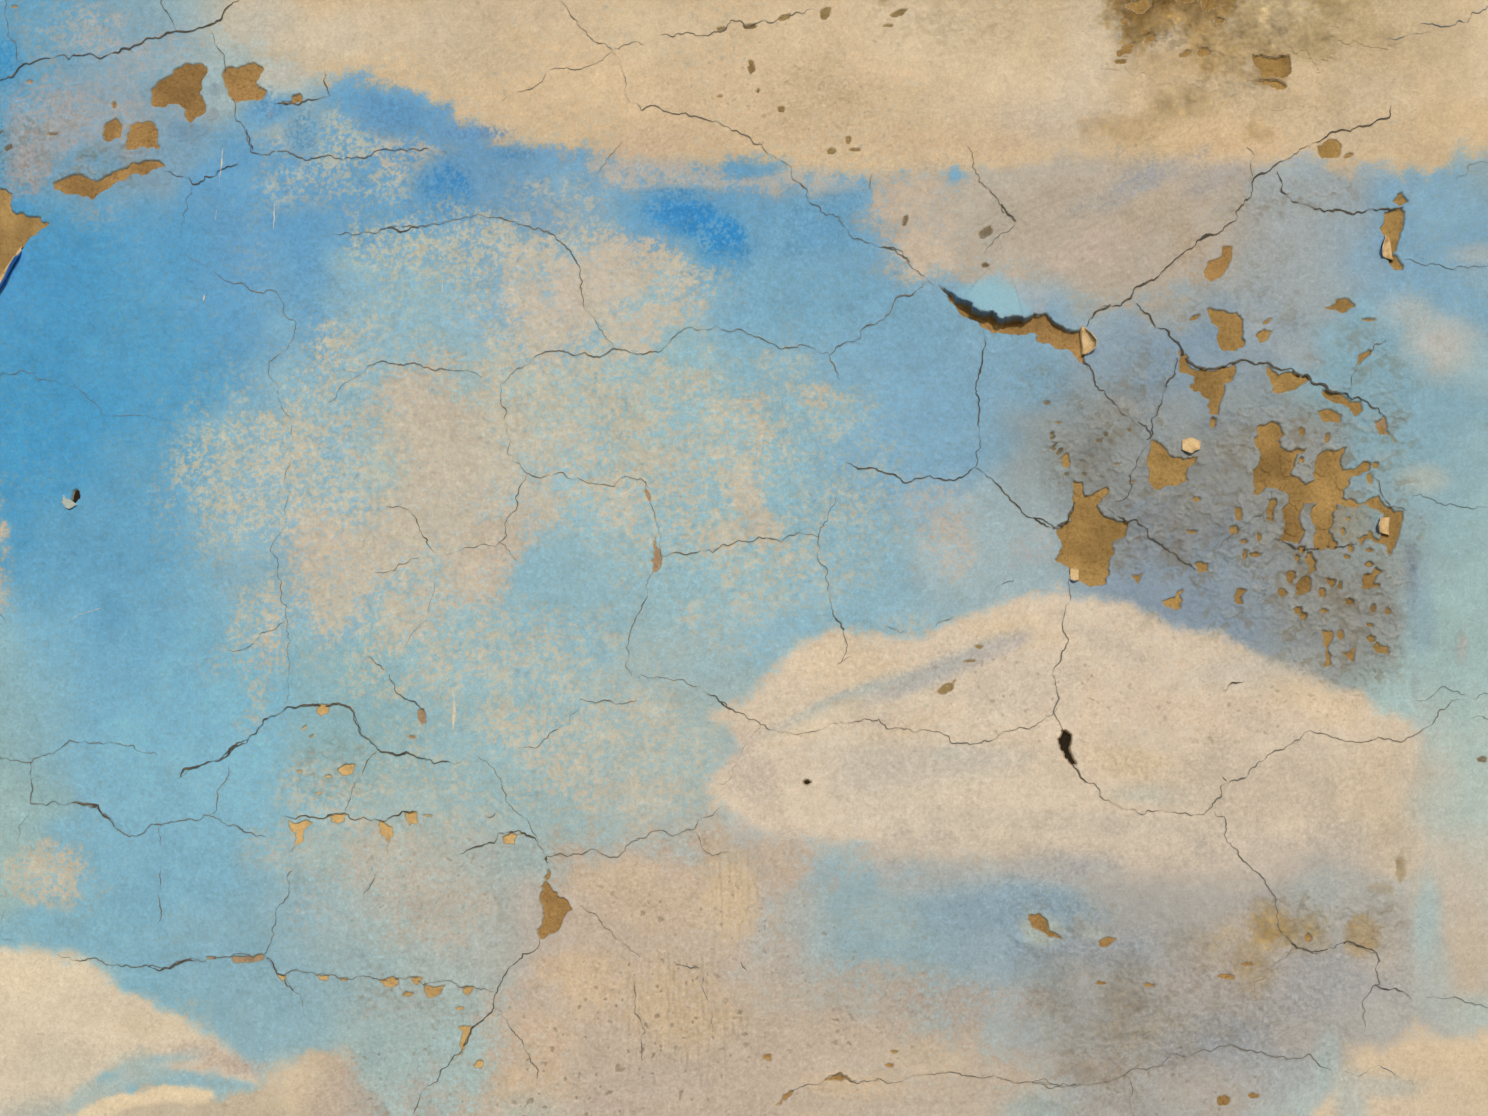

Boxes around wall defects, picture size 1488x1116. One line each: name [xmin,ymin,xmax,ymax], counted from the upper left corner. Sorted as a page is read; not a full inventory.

crack [1386,6,1488,40]
peeling [55,64,330,200]
peeling [0,190,48,287]
peeling [943,291,1097,363]
peeling [1130,309,1271,489]
crack [1083,108,1402,569]
crack [0,0,1097,1114]
peeling [1050,433,1127,586]
peeling [1230,392,1402,666]
crack [1374,477,1483,511]
crack [1073,686,1488,1027]
crack [789,1044,1415,1116]